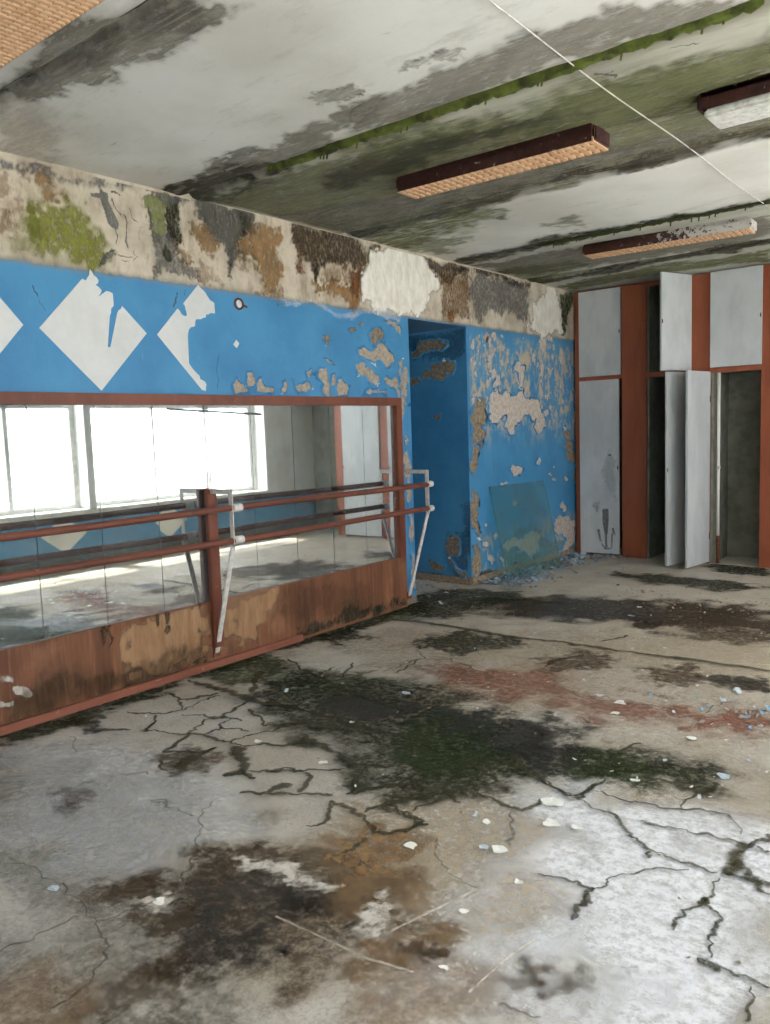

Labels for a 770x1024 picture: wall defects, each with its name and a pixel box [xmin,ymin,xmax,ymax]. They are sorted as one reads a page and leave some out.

water stain [3,0,227,102]
water stain [0,159,131,191]
peeling [90,189,119,229]
water stain [143,0,770,340]
peeling [231,318,457,420]
peeling [403,331,577,592]
water stain [480,594,770,645]
crack [69,619,770,1021]
water stain [94,706,770,1024]